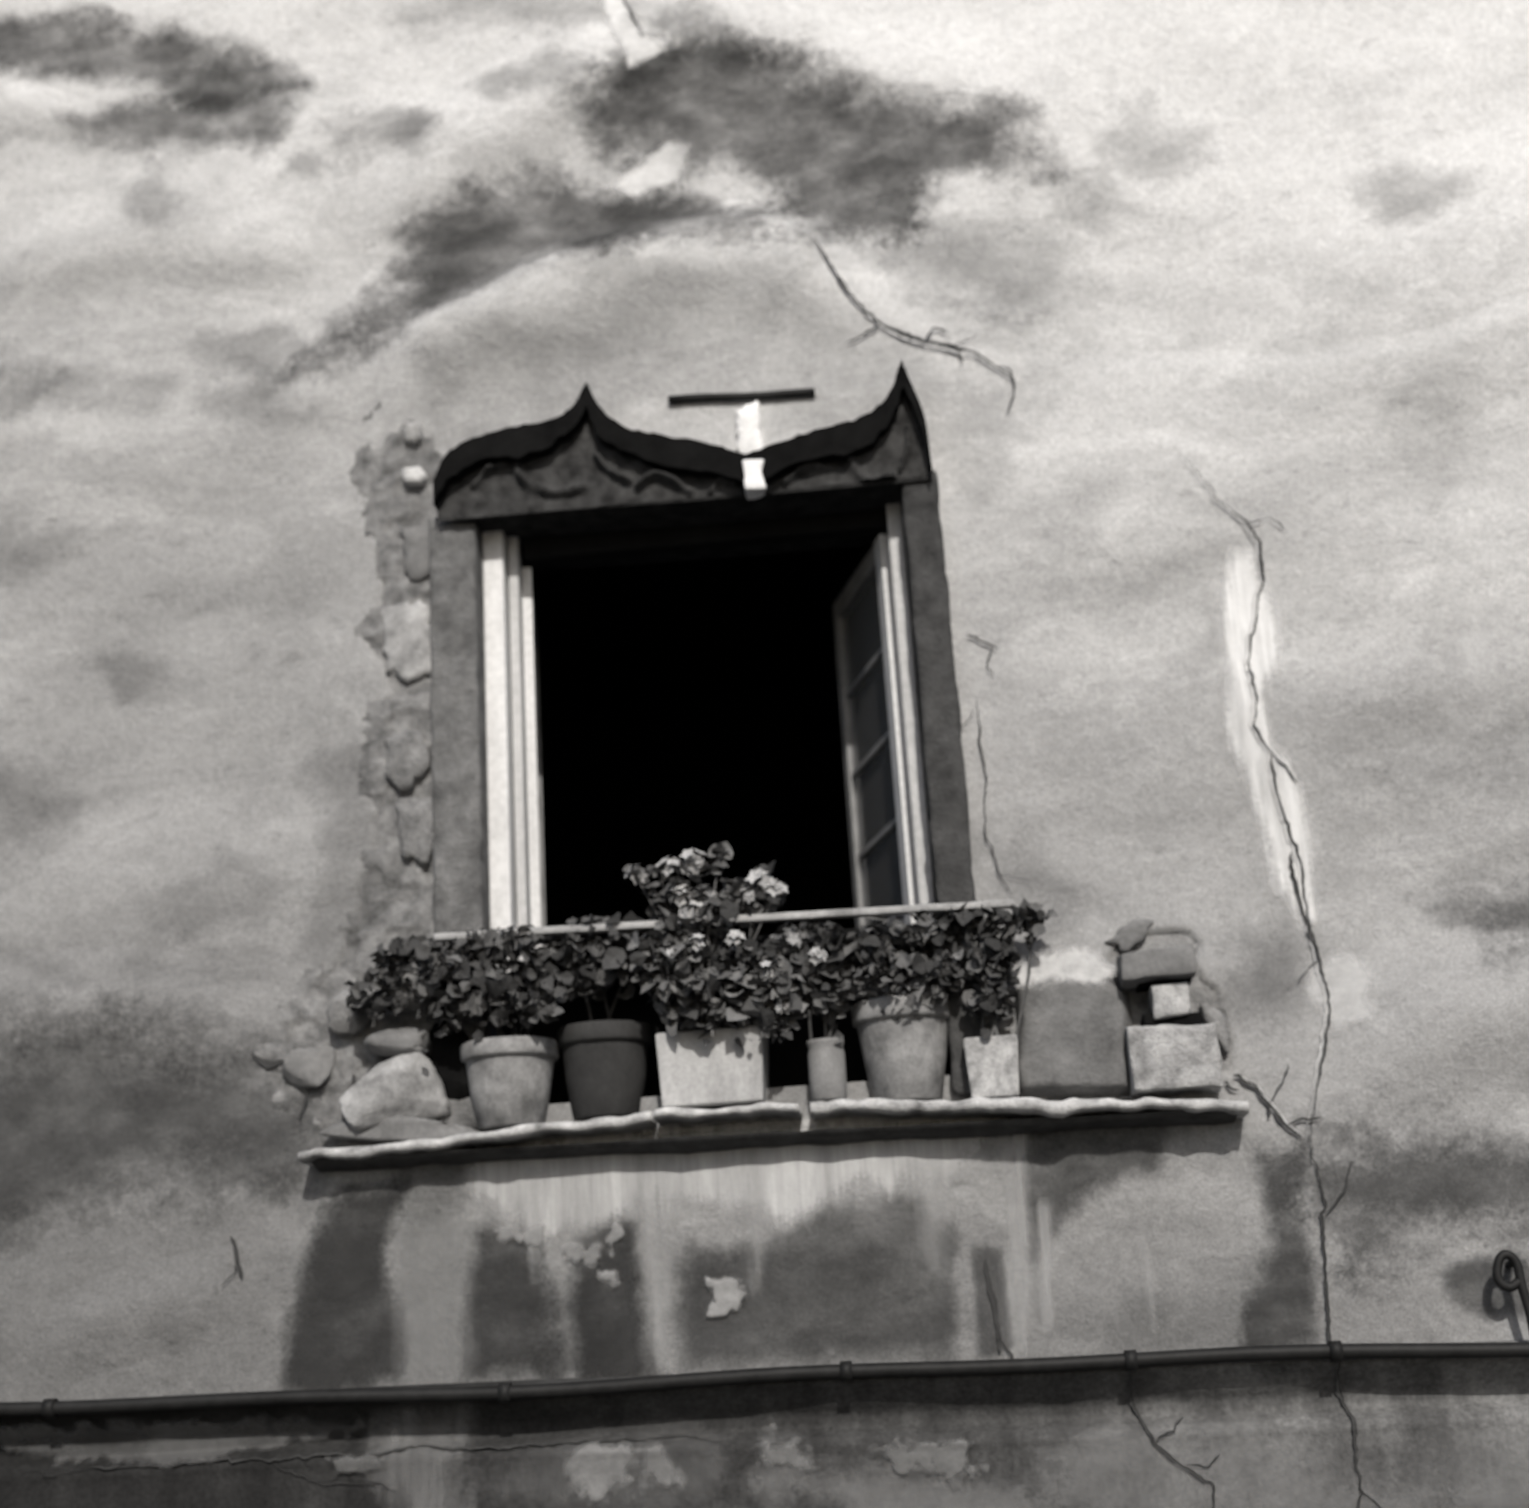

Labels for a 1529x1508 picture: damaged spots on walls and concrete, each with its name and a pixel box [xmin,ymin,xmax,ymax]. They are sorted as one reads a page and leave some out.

damp [0,11,310,143]
damp [291,0,1033,375]
crack [814,238,1015,416]
flaking render [255,419,490,1147]
crack [961,635,1029,896]
crack [1182,459,1381,1508]
damp [284,1181,406,1390]
flaking render [705,1277,745,1317]
damp [464,1113,1016,1379]
flaking render [0,1414,366,1467]
flaking render [564,1442,686,1502]
crack [1129,1371,1220,1508]